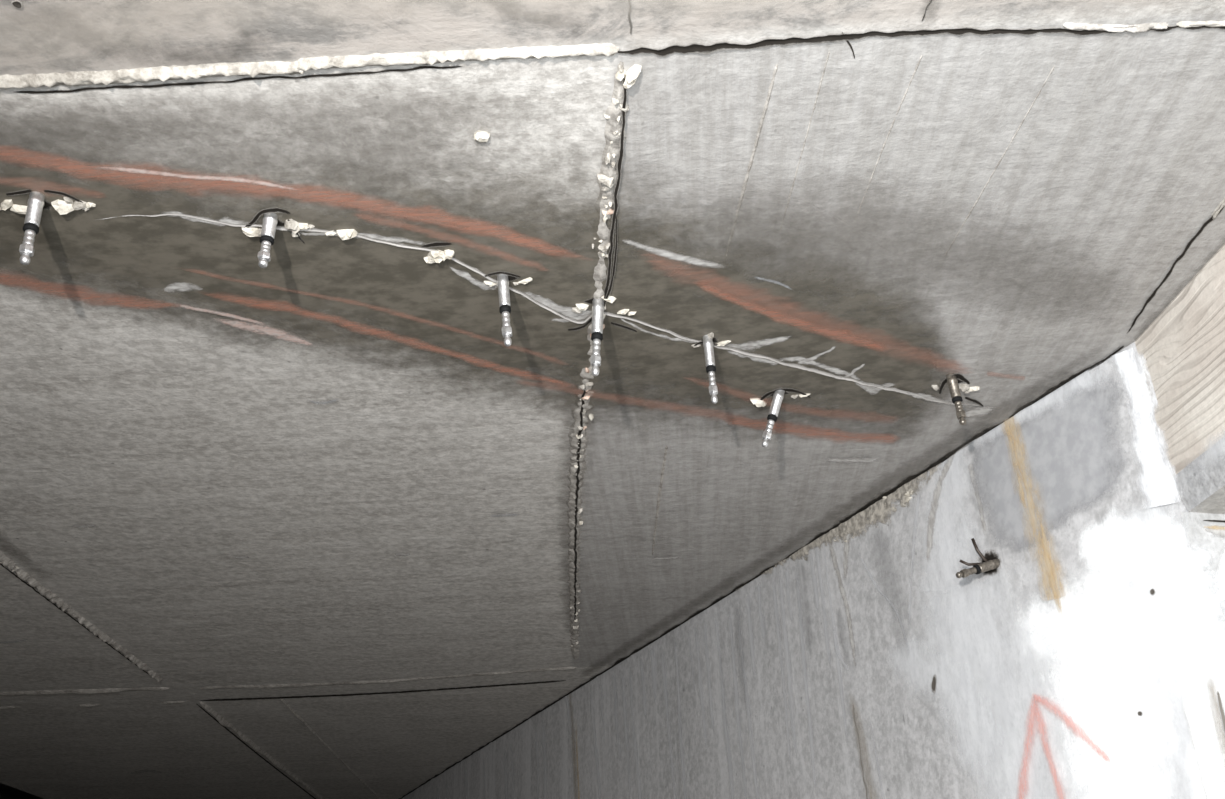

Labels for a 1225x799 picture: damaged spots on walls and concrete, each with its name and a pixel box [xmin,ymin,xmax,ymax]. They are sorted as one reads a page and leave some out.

damp [473,130,490,143]
crack [618,0,1225,59]
damp [0,145,947,434]
crack [103,197,1225,799]